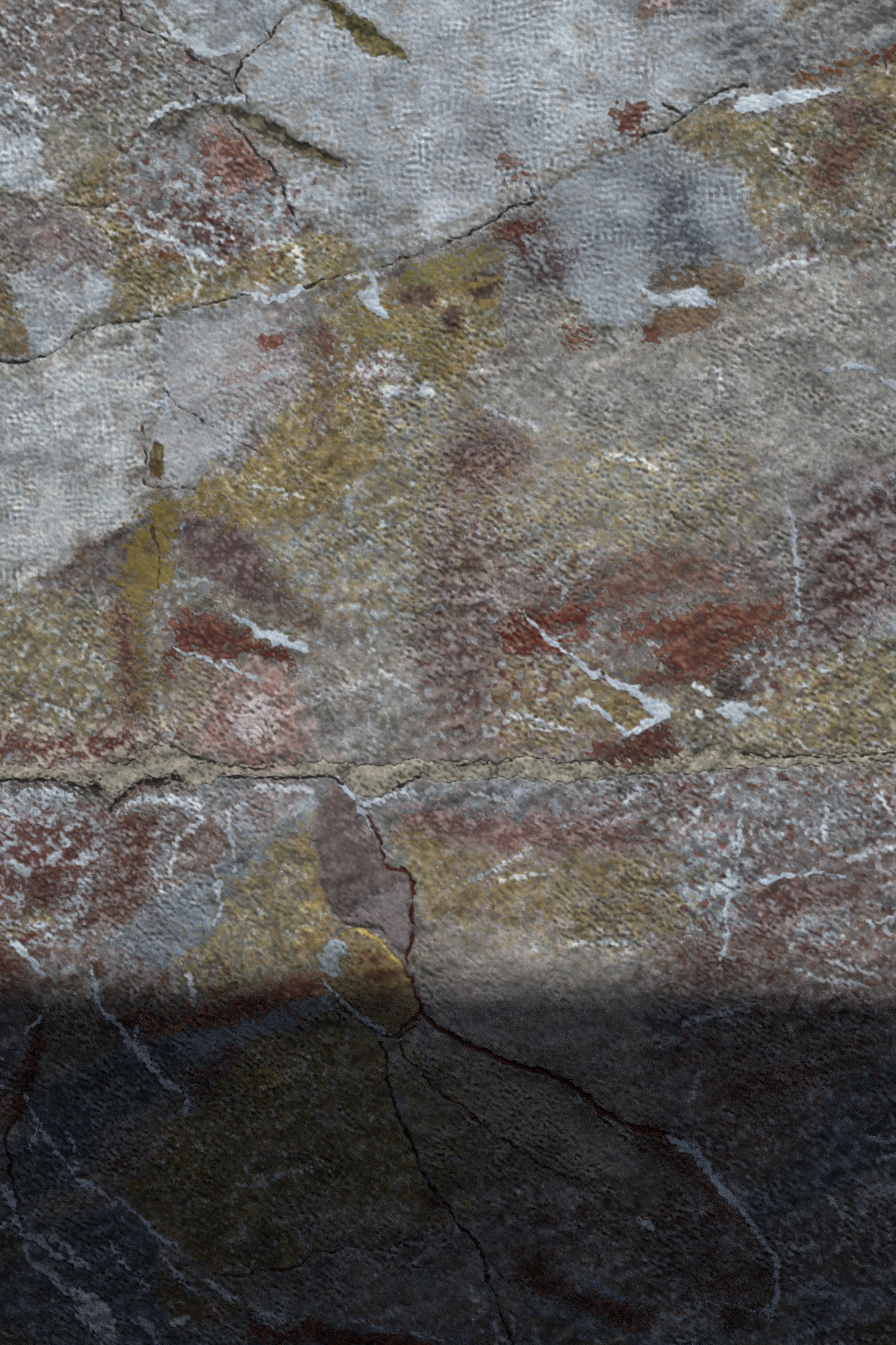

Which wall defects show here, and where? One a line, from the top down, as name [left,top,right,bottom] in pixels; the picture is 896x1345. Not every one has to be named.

crack [119,8,298,226]
crack [641,83,749,138]
crack [58,200,119,208]
crack [304,182,536,290]
crack [0,293,251,364]
crack [0,745,344,813]
crack [392,775,421,790]
crack [731,746,896,759]
crack [224,815,673,1340]